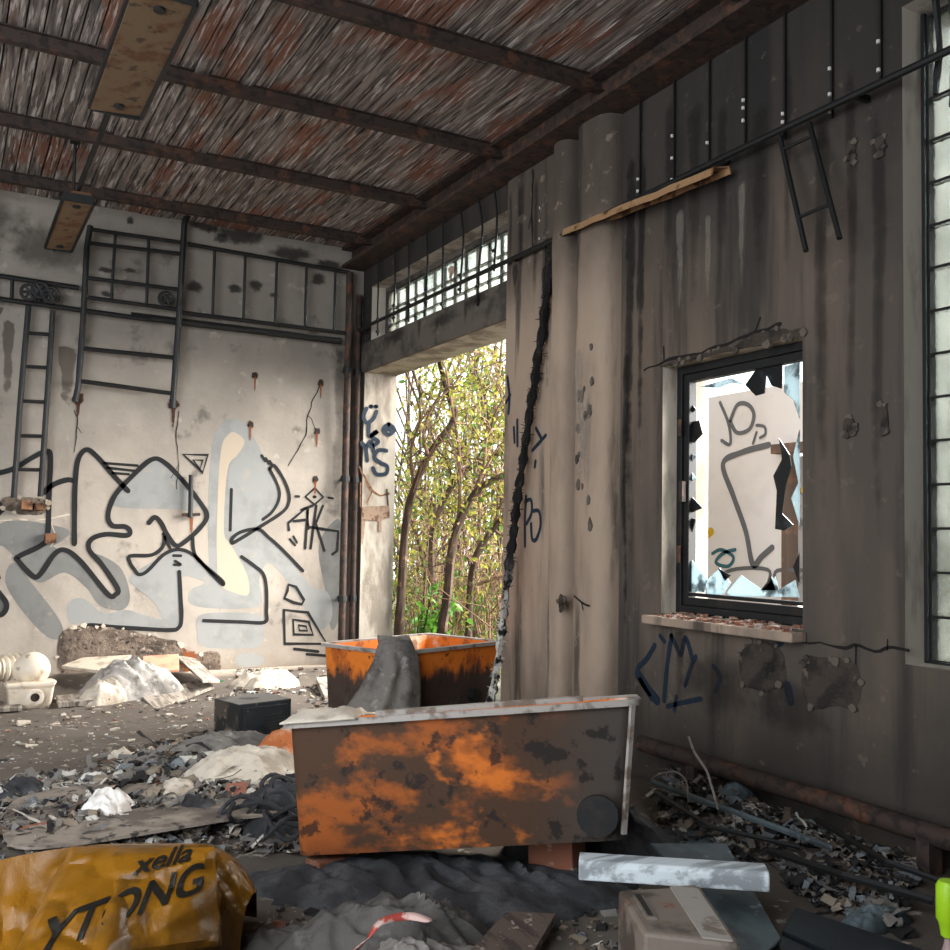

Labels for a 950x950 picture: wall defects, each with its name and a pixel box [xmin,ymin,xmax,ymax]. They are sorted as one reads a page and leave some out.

crack [288,387,320,466]
crack [801,639,910,664]